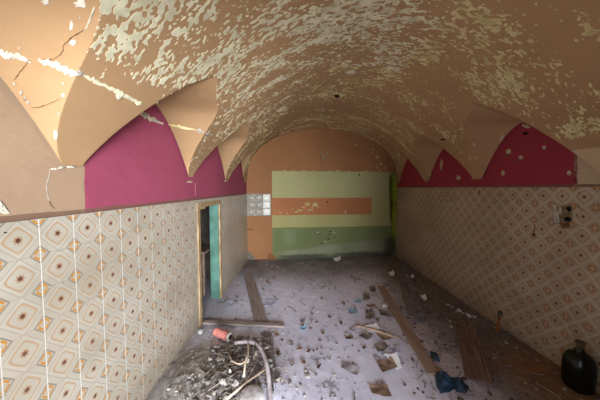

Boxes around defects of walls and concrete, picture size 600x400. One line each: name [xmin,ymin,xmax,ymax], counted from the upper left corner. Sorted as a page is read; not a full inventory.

crack [0,30,213,142]
peeling [73,0,600,184]